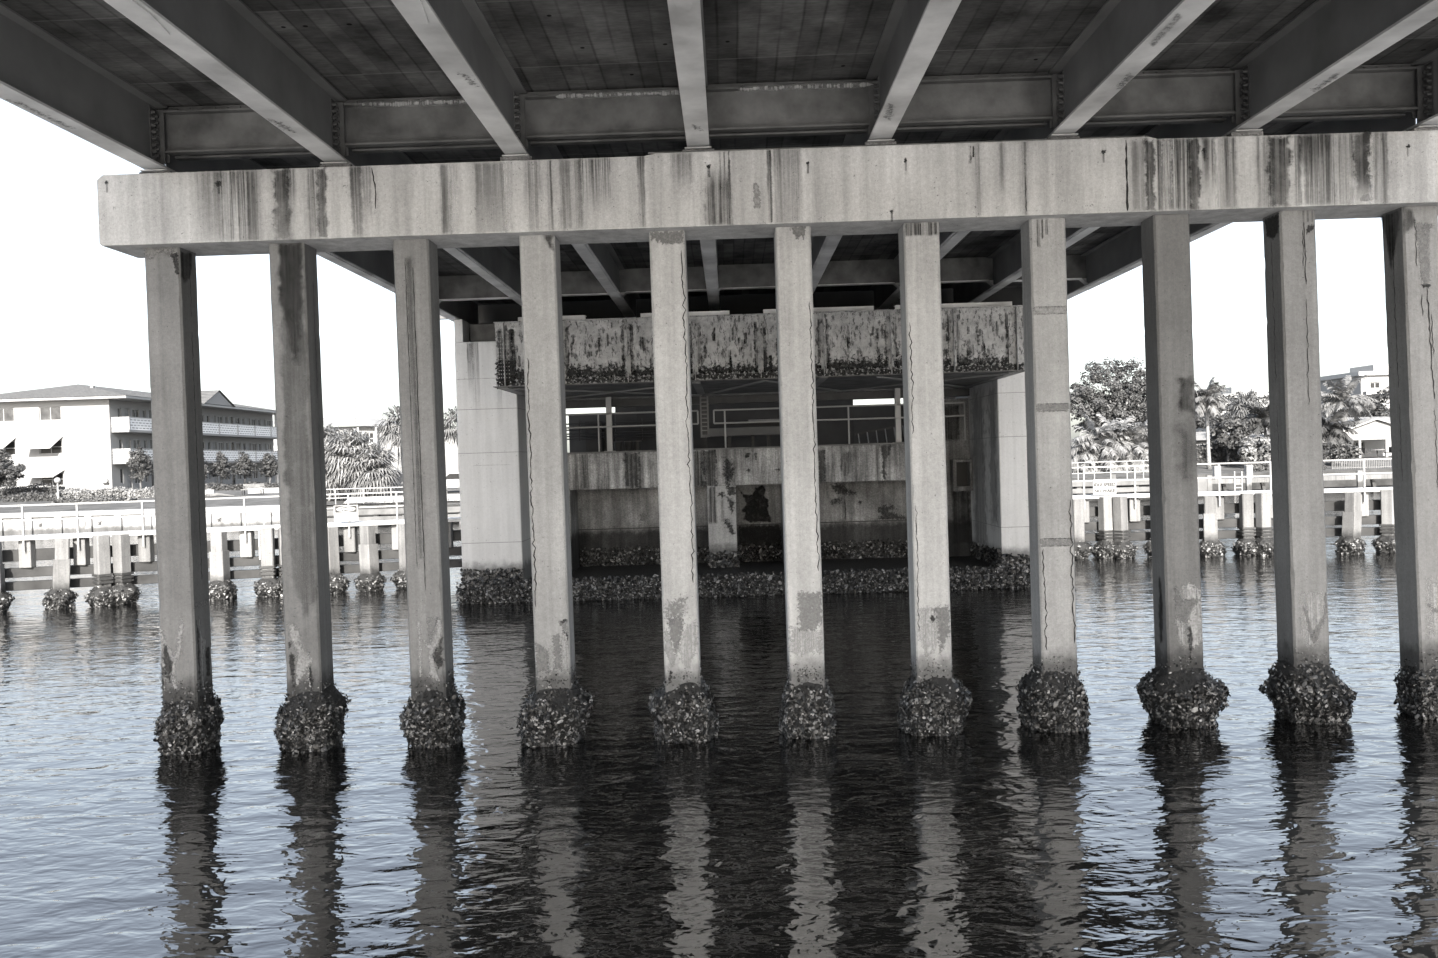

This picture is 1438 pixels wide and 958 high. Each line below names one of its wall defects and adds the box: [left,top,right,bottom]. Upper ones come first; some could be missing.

leakage [273,167,327,229]
leakage [350,167,360,201]
leakage [705,151,731,224]
leakage [767,150,780,222]
leakage [1144,137,1234,209]
leakage [1266,131,1386,204]
peeling [718,453,782,561]
peeling [159,617,210,690]
peeling [286,623,314,690]
peeling [417,617,445,681]
peeling [535,619,568,672]
peeling [1174,582,1202,648]